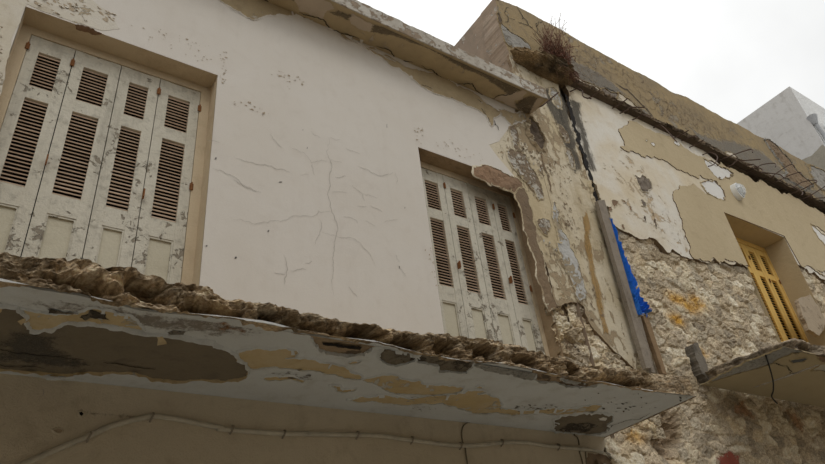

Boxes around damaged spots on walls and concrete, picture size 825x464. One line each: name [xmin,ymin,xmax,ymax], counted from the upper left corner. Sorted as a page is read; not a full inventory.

peeling [27,0,86,16]
peeling [219,0,606,328]
spalling [587,174,657,229]
peeling [700,158,734,201]
peeling [763,138,825,192]
spalling [0,252,696,438]